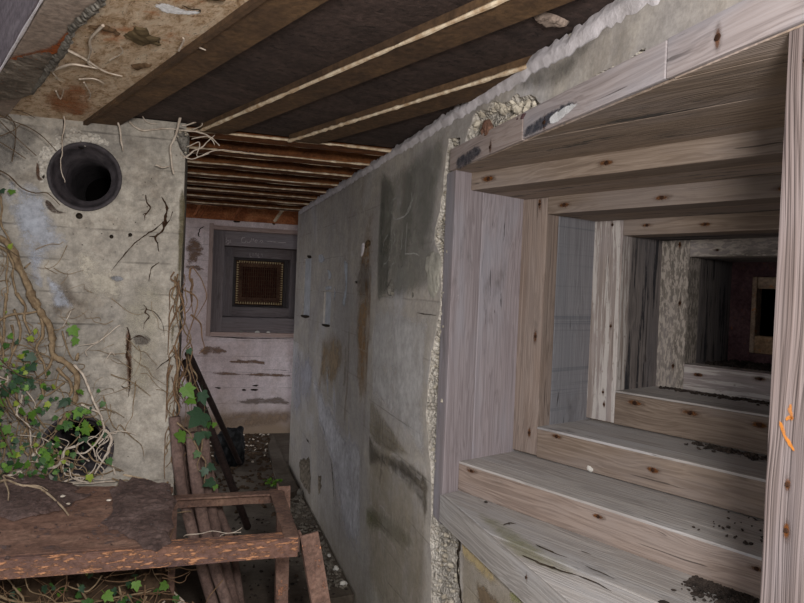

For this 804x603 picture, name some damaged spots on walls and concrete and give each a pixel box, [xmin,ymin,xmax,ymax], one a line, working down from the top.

water stain [186,0,527,211]
water stain [379,146,440,293]
peeling [200,346,227,355]
peeling [212,359,290,405]
water stain [295,356,427,537]
rust [358,243,369,383]
spalling [425,93,541,603]
crack [455,540,463,603]
water stain [477,586,497,603]